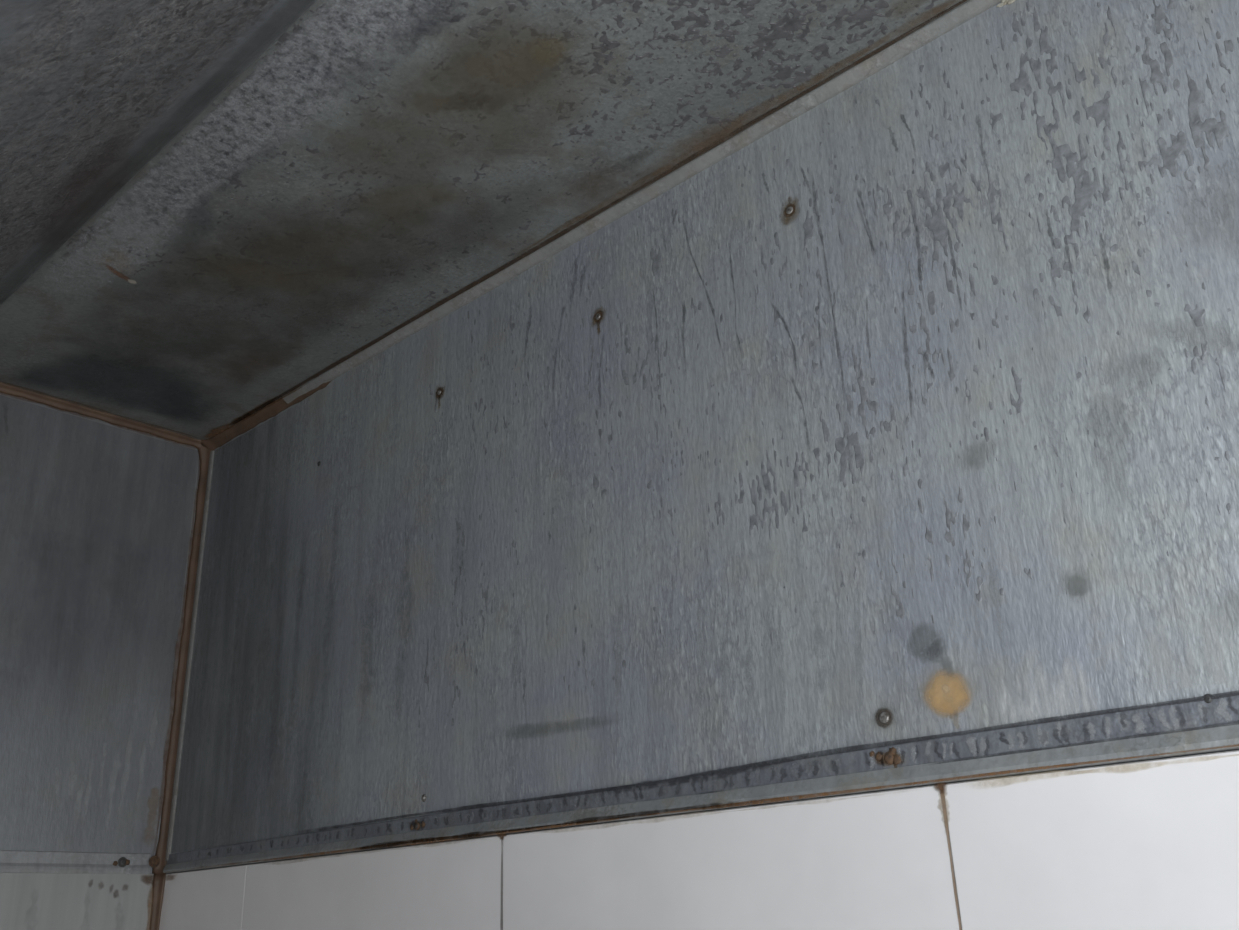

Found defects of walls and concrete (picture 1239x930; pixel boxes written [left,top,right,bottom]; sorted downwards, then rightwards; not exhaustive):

damp [33,0,453,276]
rust [929,675,968,714]